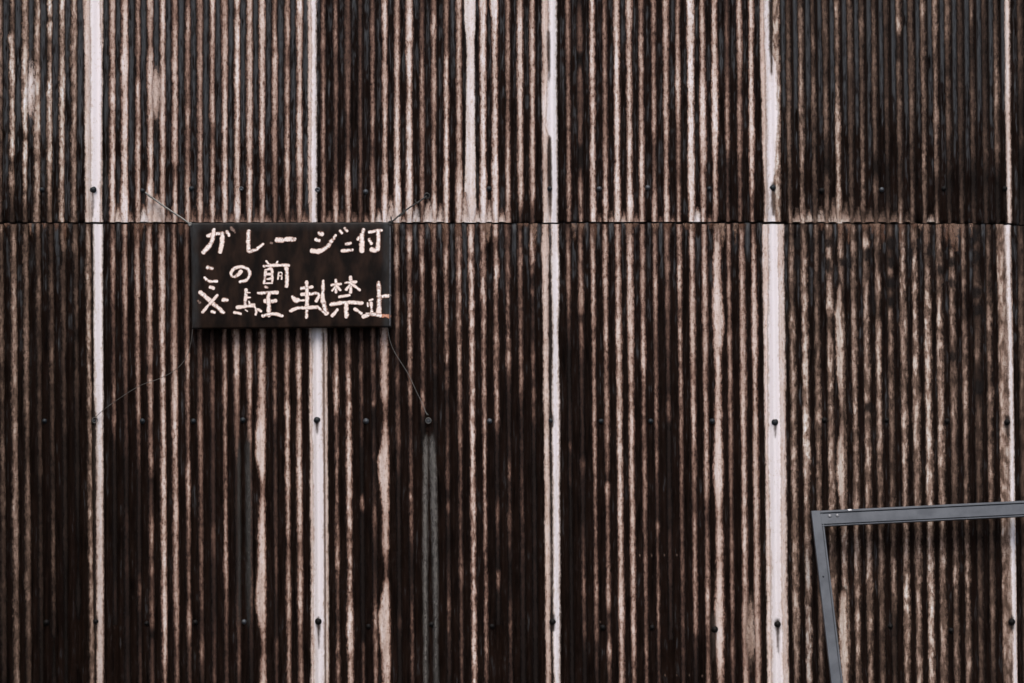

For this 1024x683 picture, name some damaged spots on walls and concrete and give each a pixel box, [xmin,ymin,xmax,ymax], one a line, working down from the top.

corrosion [794,223,980,306]